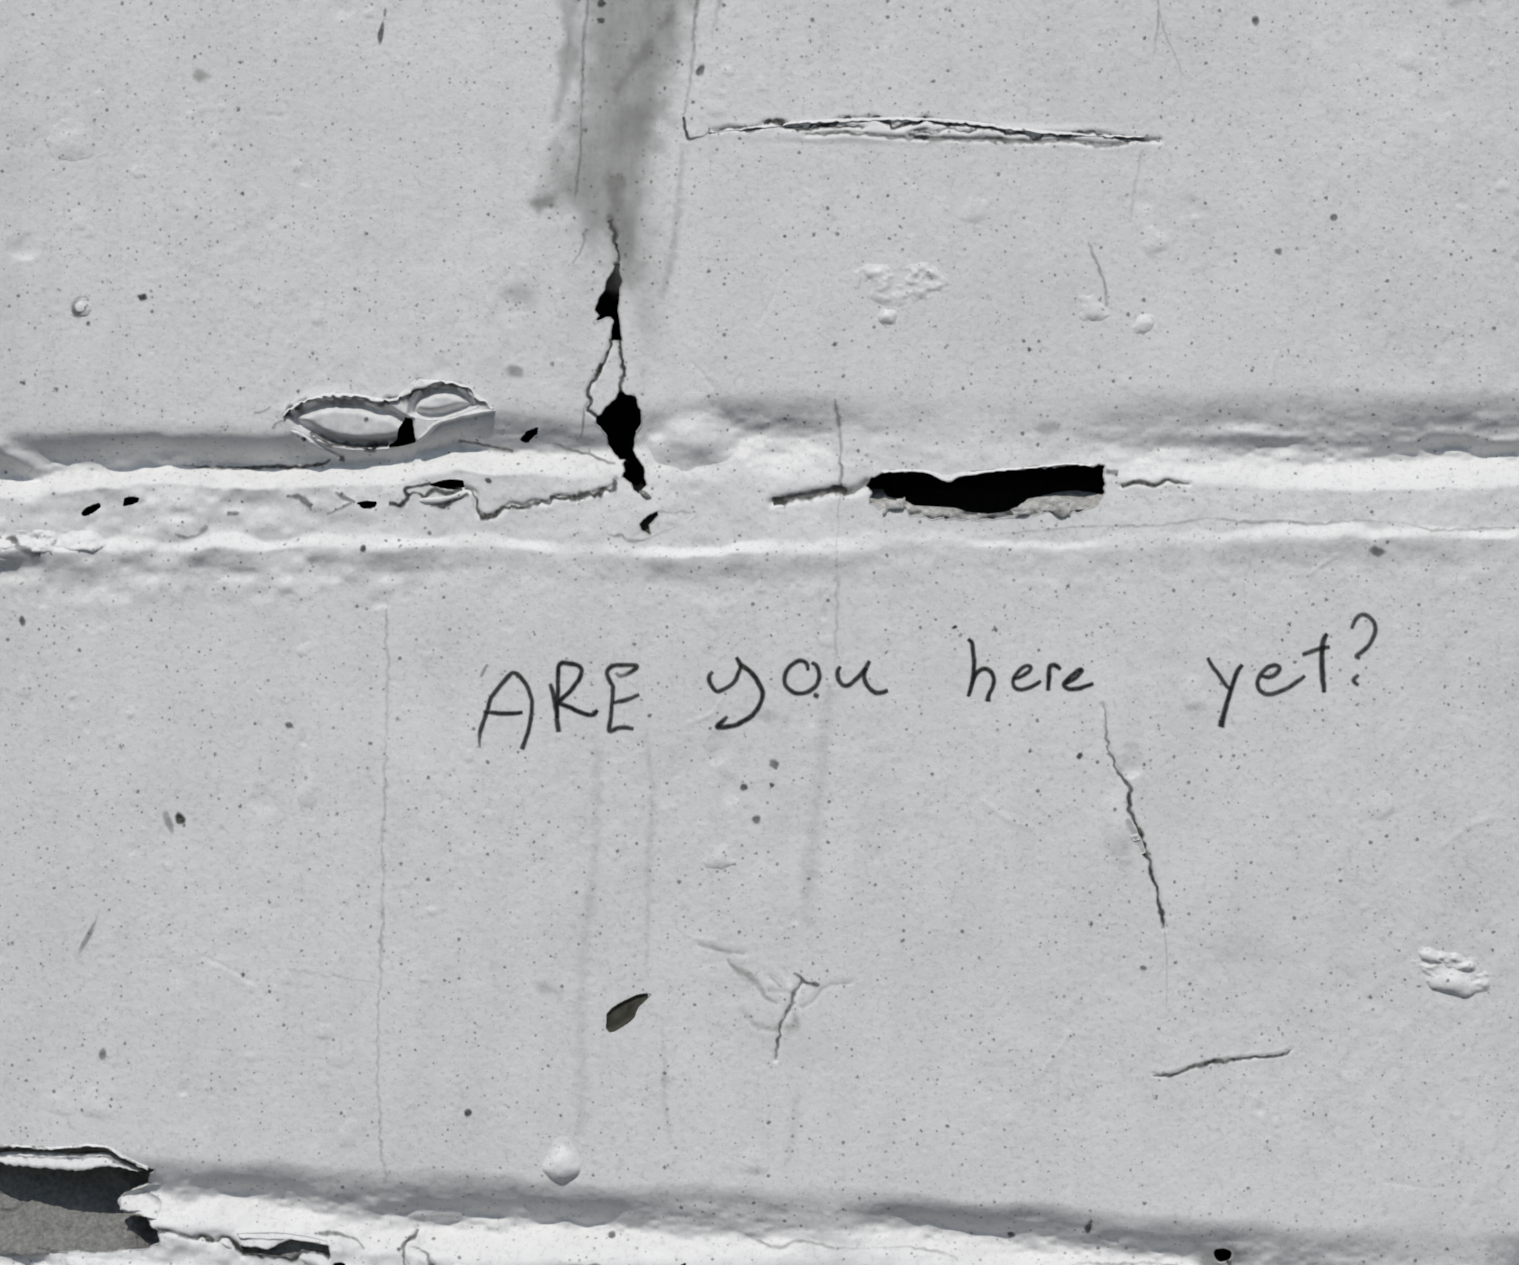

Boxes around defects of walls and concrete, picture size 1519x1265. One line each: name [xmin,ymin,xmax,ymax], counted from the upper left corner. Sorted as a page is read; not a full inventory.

crack [683,115,1150,146]
crack [459,220,652,520]
spalling [863,462,1107,522]
crack [1107,740,1164,923]
crack [1155,1051,1289,1077]
spalling [0,1144,162,1256]
spalling [240,1237,331,1258]